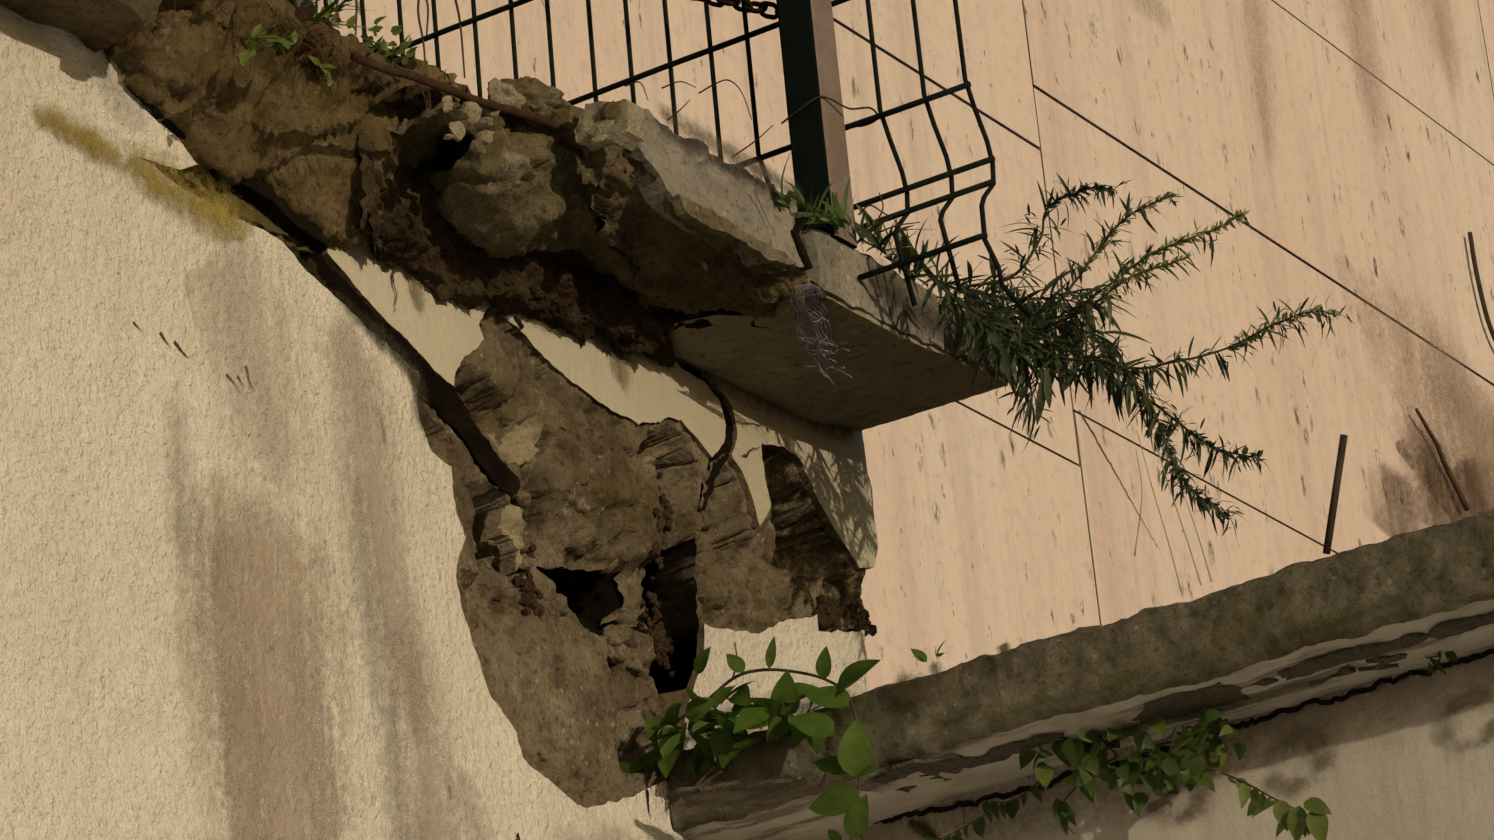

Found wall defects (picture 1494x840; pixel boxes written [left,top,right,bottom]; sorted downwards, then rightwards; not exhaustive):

leakage [37,109,121,166]
spalling [176,168,315,254]
crack [123,68,520,495]
spalling [671,194,797,267]
crack [659,190,827,330]
leakage [347,302,428,429]
crack [681,367,761,511]
spalling [417,309,870,808]
leakage [197,489,336,840]
peeling [1131,611,1494,724]
peeling [865,732,1064,793]
leakage [855,652,1494,840]